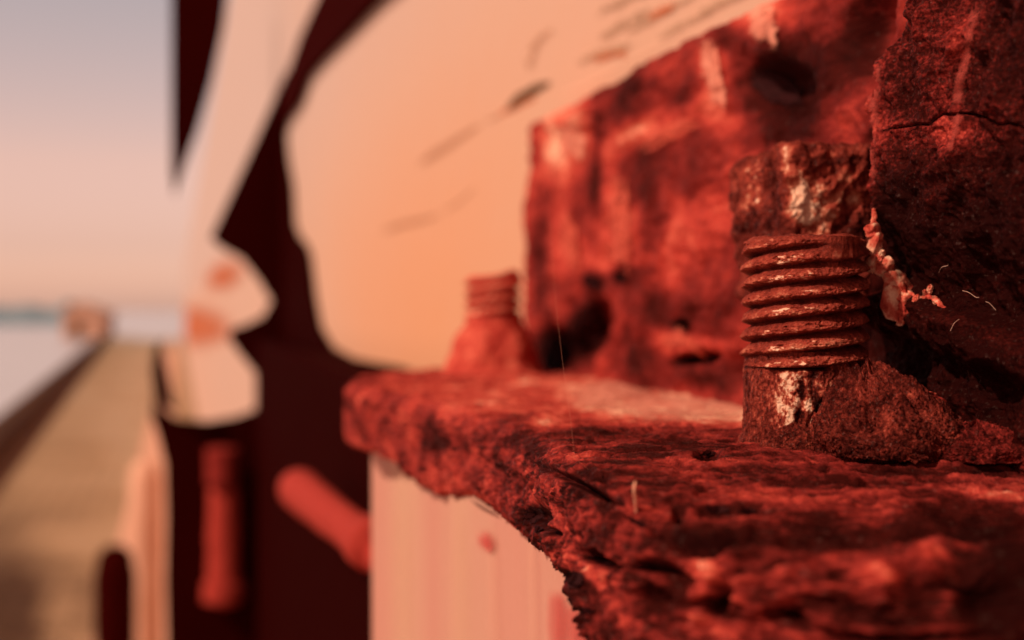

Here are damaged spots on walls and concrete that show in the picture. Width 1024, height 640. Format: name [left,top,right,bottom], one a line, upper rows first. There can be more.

crack [881,113,1024,133]